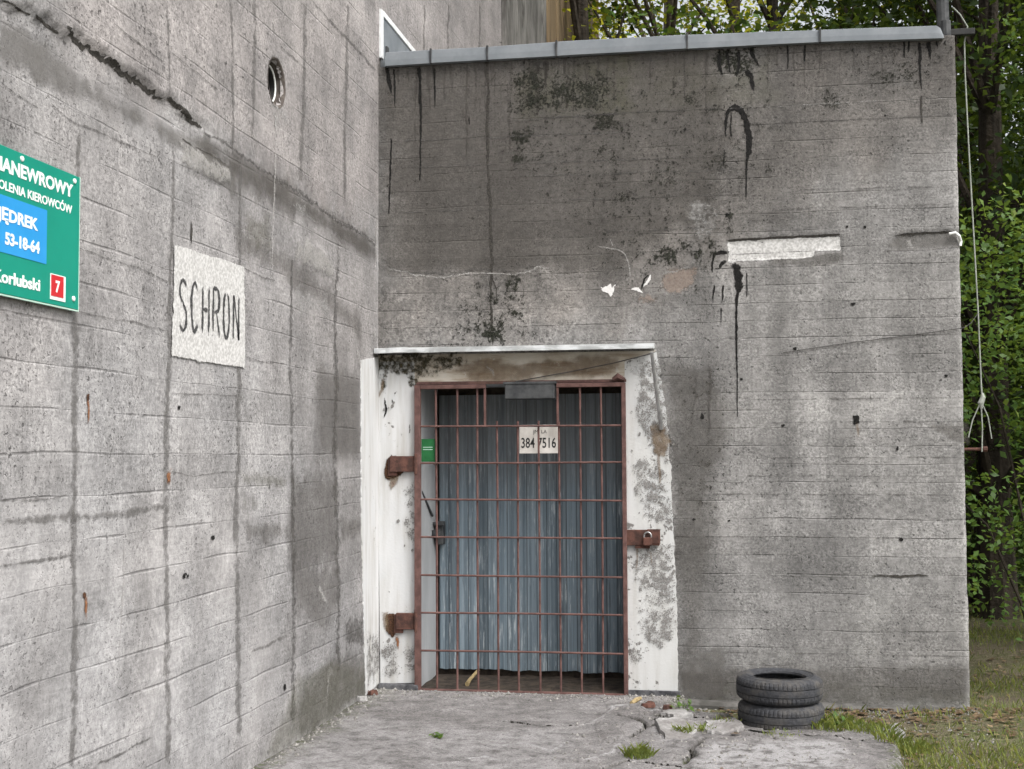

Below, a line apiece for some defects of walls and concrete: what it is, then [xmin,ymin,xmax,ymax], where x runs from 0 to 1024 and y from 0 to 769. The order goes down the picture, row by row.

crack [3,0,229,167]
damp [417,67,436,180]
damp [821,41,957,110]
damp [496,45,795,537]
rust [384,455,403,488]
peeling [631,356,675,524]
rust [383,613,399,648]
peeling [630,544,681,665]